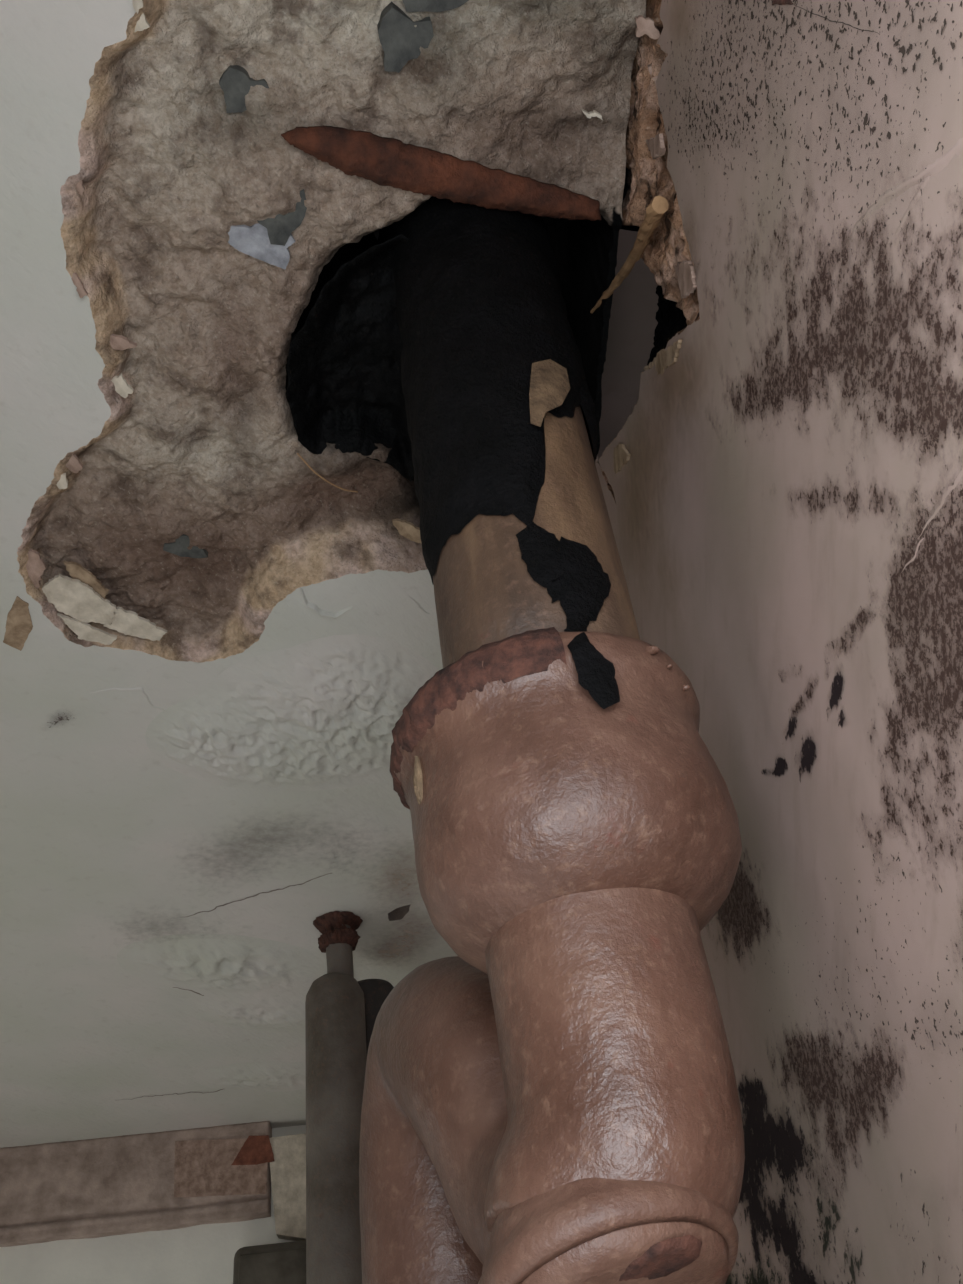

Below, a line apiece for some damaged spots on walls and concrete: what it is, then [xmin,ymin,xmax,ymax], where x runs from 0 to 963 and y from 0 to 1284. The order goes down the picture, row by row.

spalling [3,0,700,663]
corrosion [281,126,602,221]
water stain [657,0,963,1284]